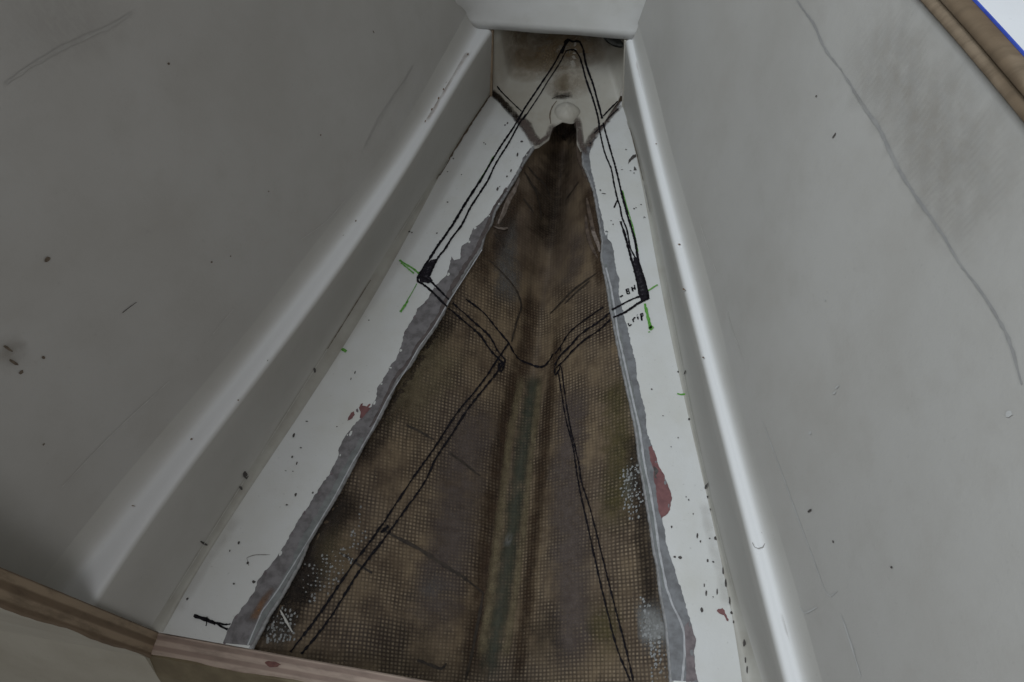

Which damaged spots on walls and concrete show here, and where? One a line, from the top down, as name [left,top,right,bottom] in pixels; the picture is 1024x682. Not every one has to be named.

peeling [223,141,531,646]
peeling [576,137,734,682]